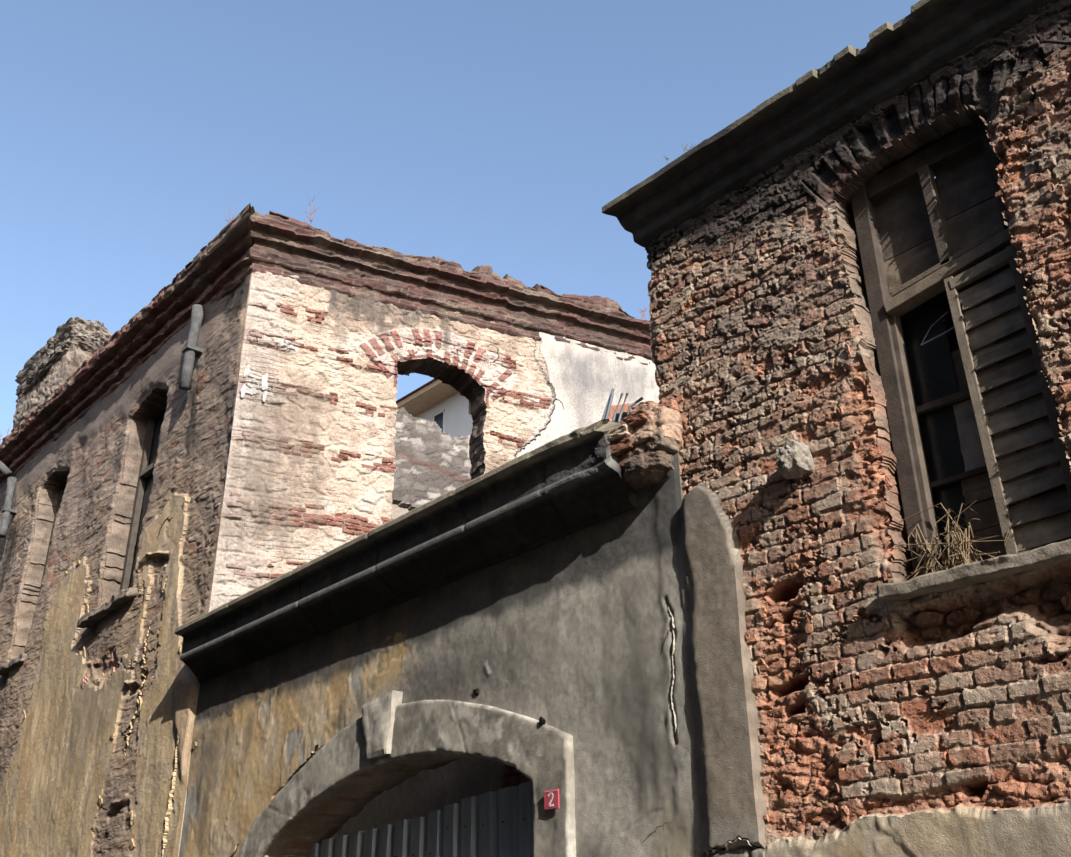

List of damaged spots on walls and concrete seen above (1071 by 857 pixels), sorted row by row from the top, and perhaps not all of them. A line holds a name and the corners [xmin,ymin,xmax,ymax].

spalling [995,131,1071,414]
spalling [607,399,684,491]
spalling [837,344,895,582]
flaking render [0,493,200,857]
crack [661,599,677,744]
spalling [745,565,1071,838]
crack [707,835,766,857]